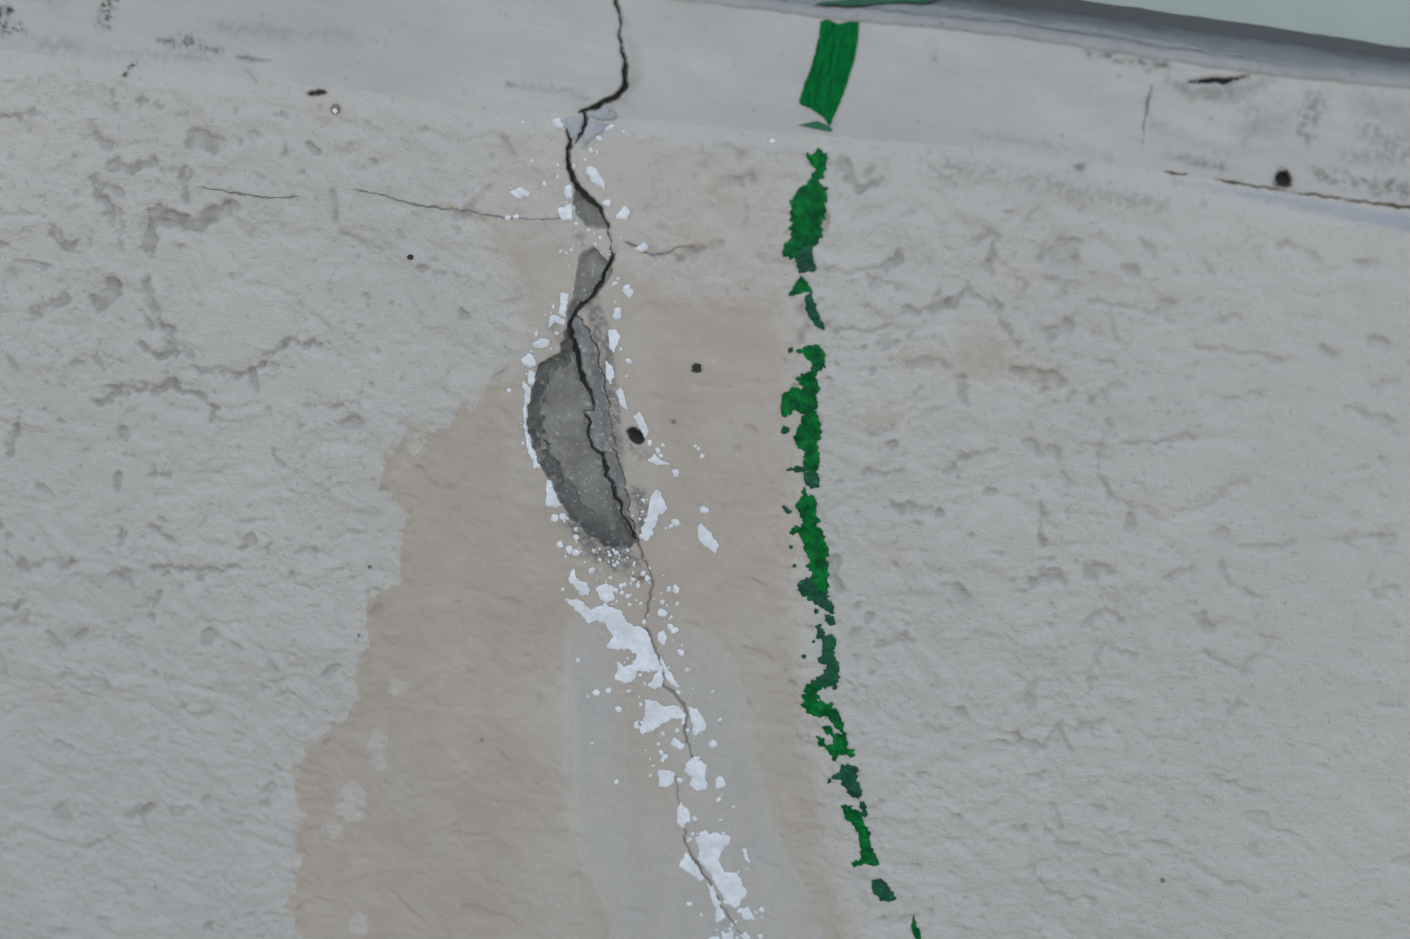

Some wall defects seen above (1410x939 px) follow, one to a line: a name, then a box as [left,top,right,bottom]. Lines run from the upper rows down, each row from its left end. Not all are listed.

crack [196,186,298,199]
crack [354,0,743,935]
leakage [283,205,852,939]
spalling [505,108,765,939]